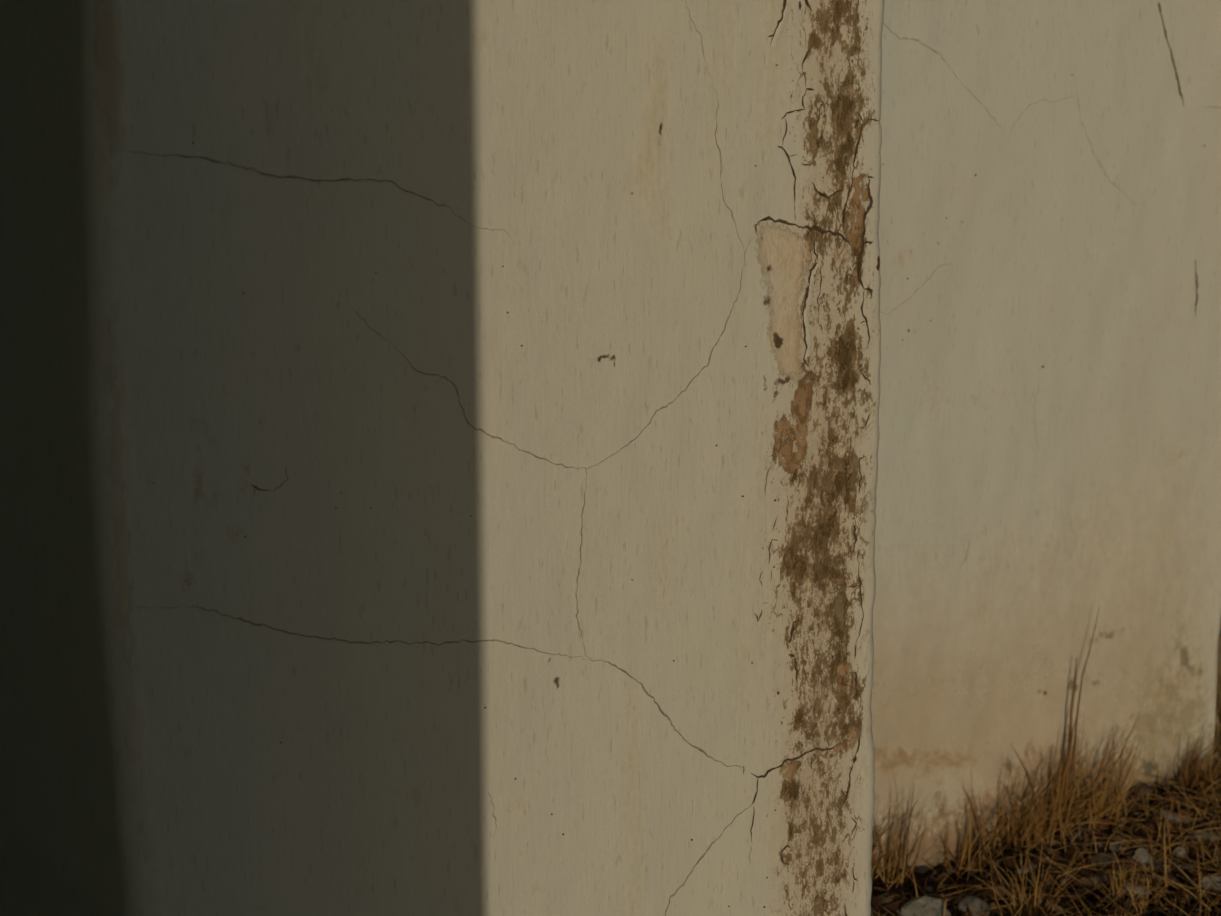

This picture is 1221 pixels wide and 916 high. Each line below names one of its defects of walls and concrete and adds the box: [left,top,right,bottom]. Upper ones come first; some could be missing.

peeling [833,173,871,262]
crack [125,0,952,916]
peeling [757,223,815,474]